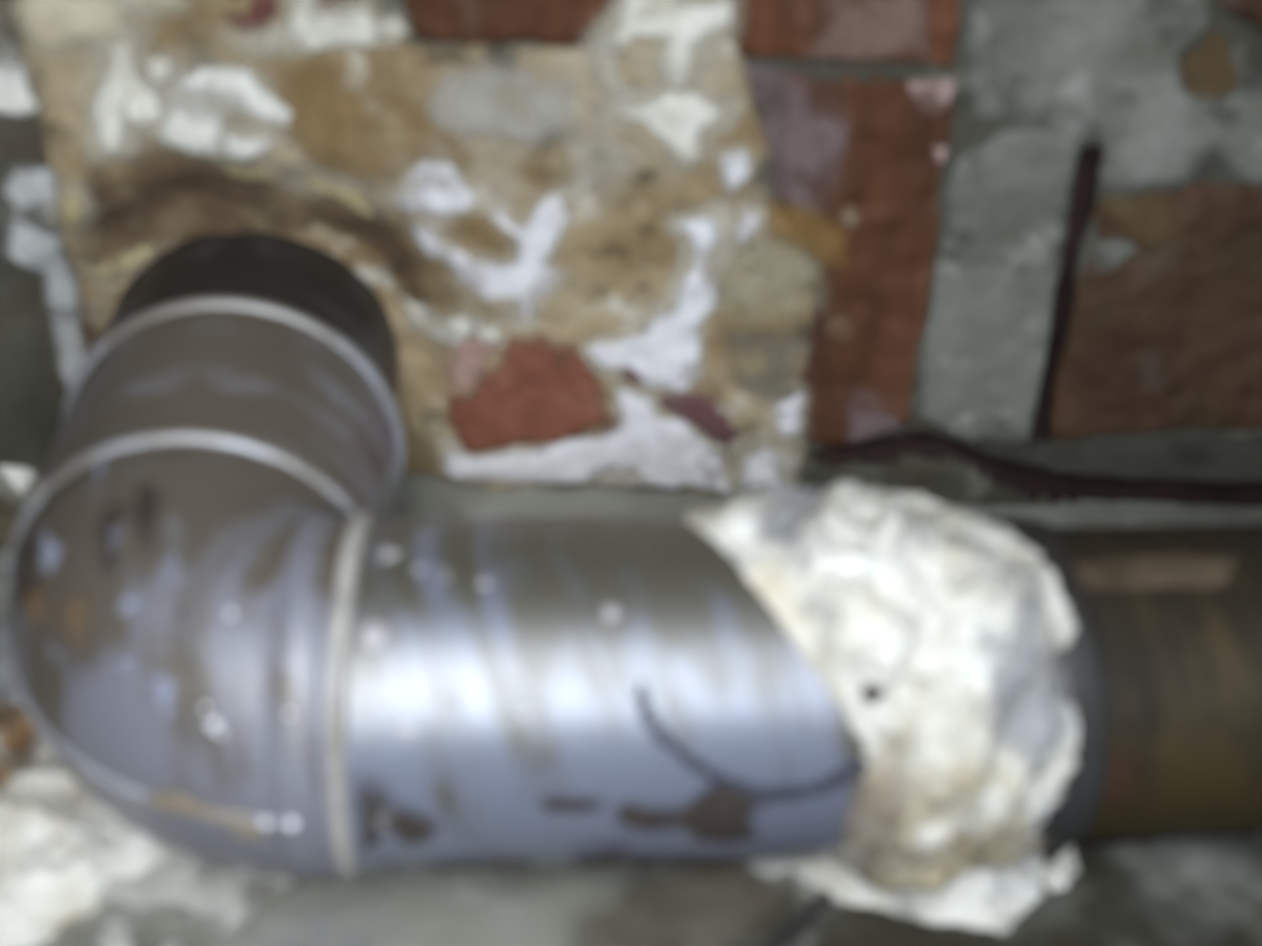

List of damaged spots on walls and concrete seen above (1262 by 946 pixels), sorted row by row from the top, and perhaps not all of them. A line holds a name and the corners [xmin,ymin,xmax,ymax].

flaking render [4,170,172,387]
flaking render [19,0,406,216]
flaking render [396,161,475,213]
flaking render [402,193,804,493]
flaking render [592,0,743,167]
flaking render [722,152,749,190]
flaking render [1097,239,1137,268]